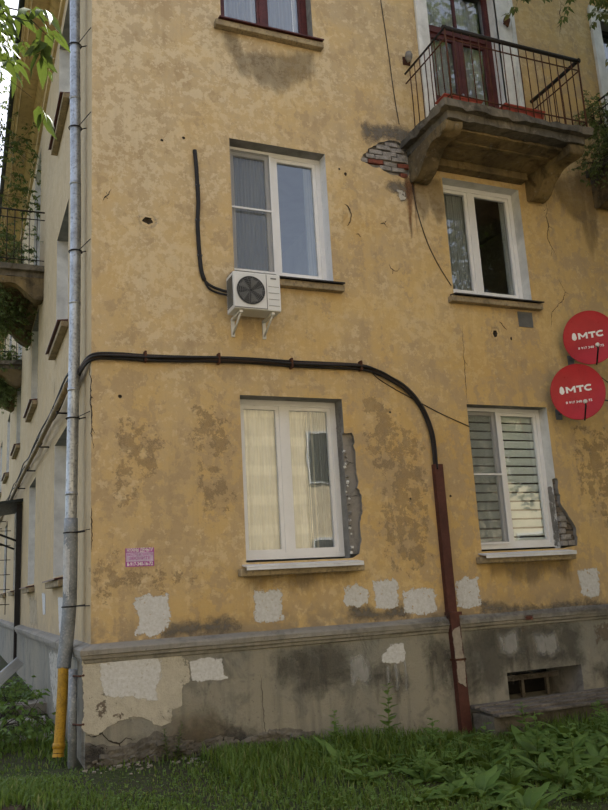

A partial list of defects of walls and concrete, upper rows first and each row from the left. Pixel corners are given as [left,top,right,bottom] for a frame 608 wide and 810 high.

spalling [361,123,409,200]
spalling [335,407,363,554]
spalling [548,478,578,546]
peeling [81,656,320,769]